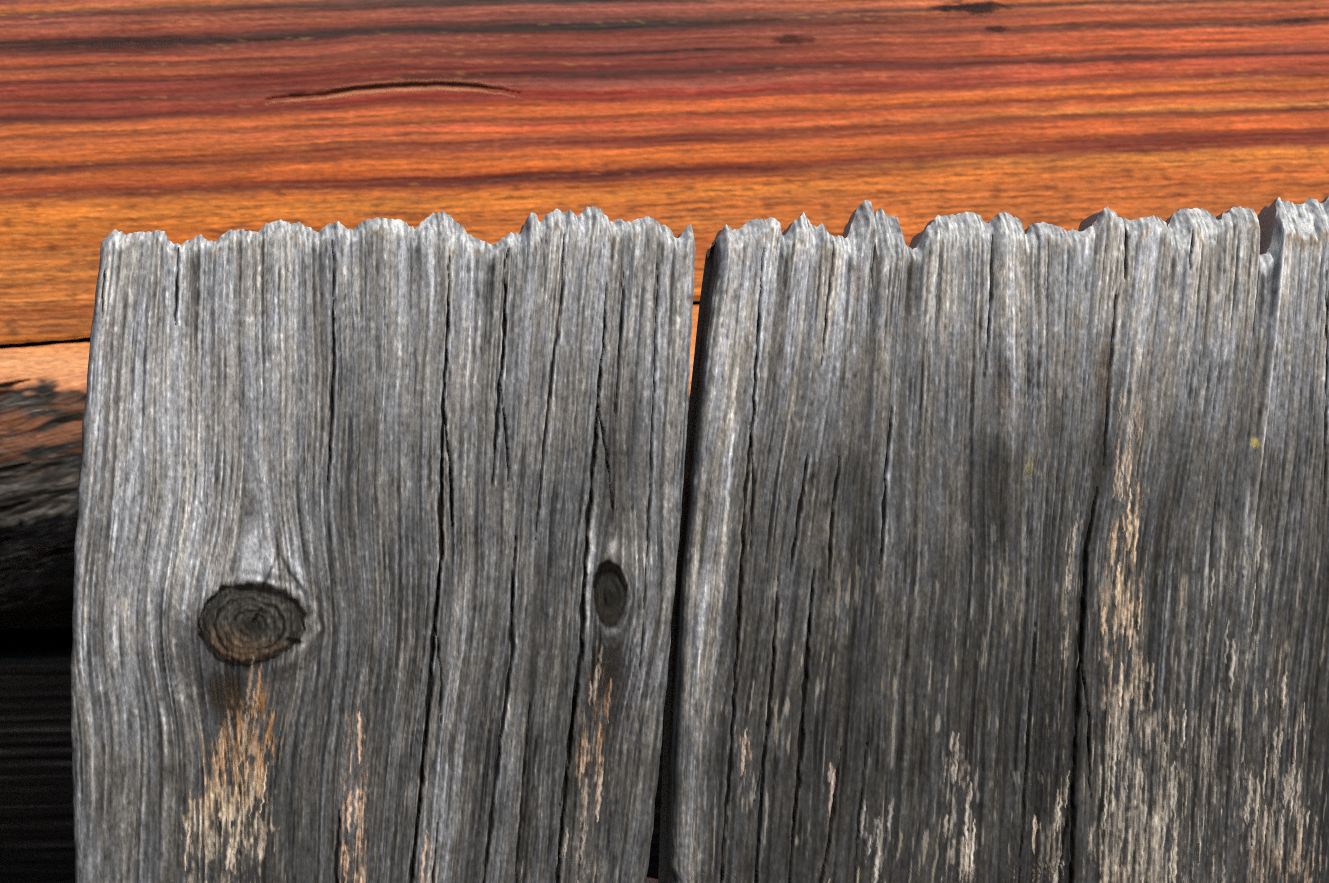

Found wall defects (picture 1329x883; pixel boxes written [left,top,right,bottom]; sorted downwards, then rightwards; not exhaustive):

crack [267,83,520,103]
crack [410,257,453,883]
crack [483,236,564,883]
crack [556,272,624,883]
crack [639,264,659,690]
crack [1018,693,1030,882]
crack [1058,218,1127,883]